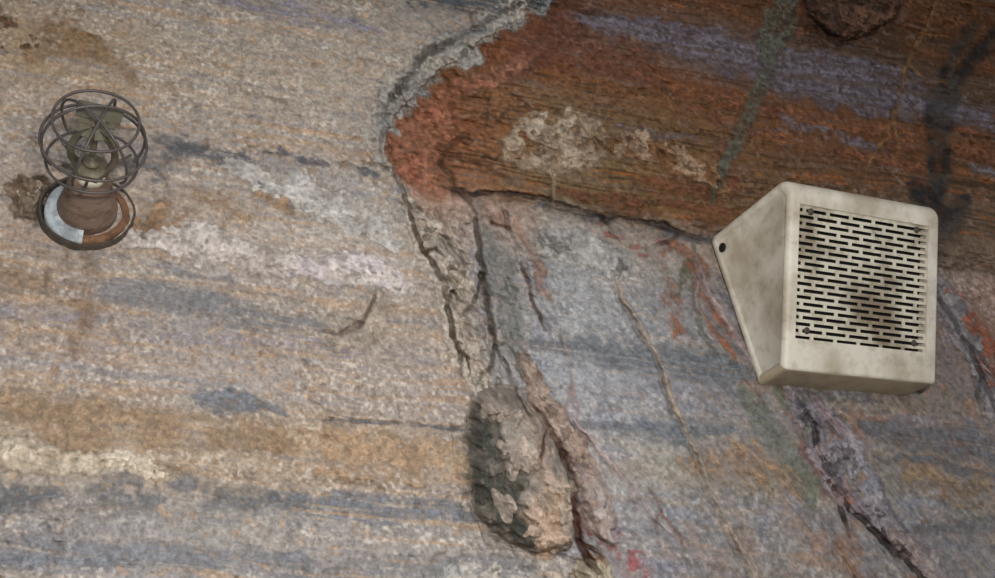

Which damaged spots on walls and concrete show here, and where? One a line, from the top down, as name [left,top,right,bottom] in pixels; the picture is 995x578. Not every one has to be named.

spalling [361,0,551,170]
spalling [502,106,731,197]
water stain [572,8,995,232]
crack [403,159,508,377]
crack [586,210,613,223]
crack [647,221,699,243]
crack [521,269,566,347]
crack [695,279,753,364]
crack [423,423,460,431]
crack [518,395,567,463]
crack [571,495,596,568]
crack [838,499,923,578]